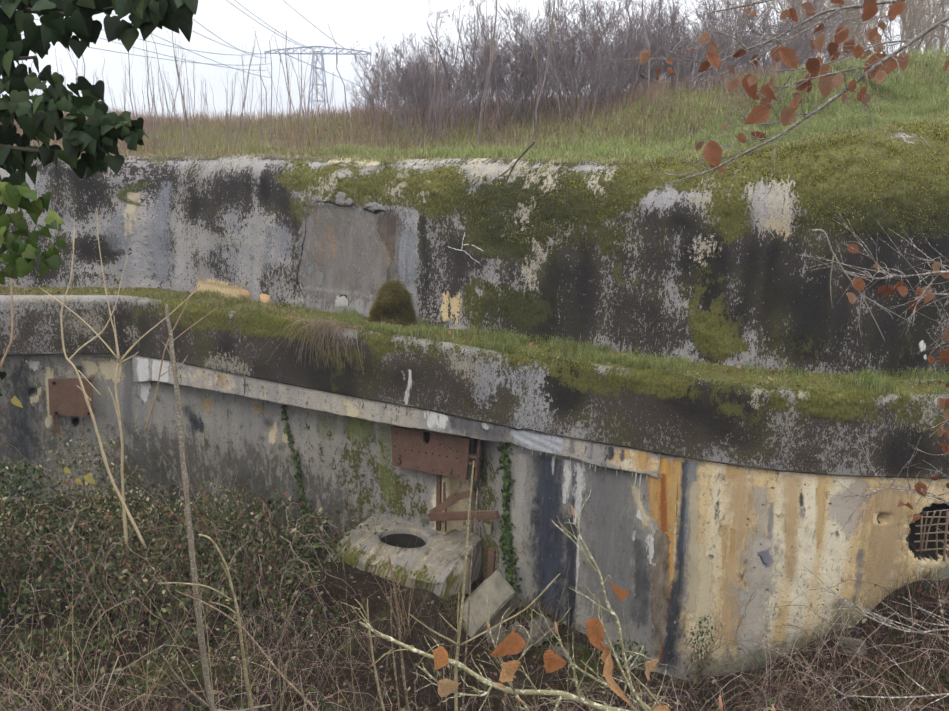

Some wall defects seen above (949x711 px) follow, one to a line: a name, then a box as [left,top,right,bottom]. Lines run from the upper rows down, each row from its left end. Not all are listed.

peeling [583,164,615,199]
leakage [109,182,149,249]
spalling [292,158,561,309]
rust [625,449,682,628]
spalling [917,557,946,569]